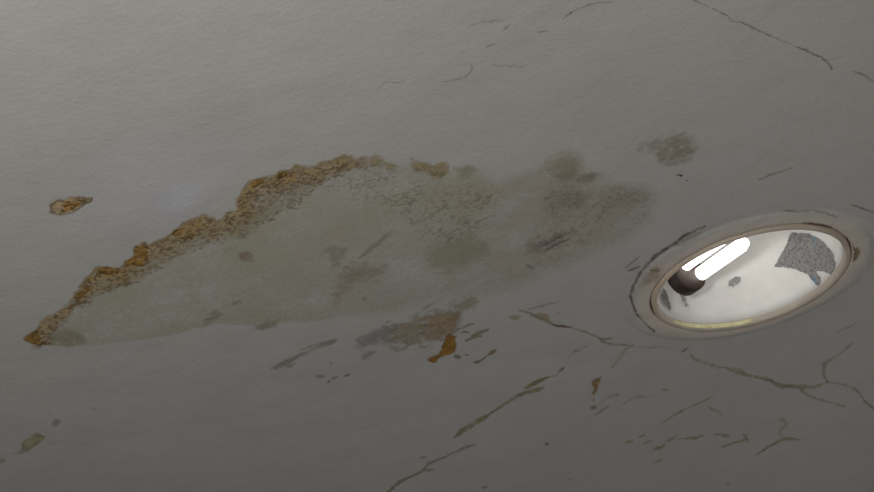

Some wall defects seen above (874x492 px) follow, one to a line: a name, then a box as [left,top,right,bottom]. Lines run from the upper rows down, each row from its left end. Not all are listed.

crack [787,210,839,232]
damp [24,155,377,348]
crack [626,226,705,332]
damp [358,299,471,356]
corrosion [428,335,457,363]
crack [511,310,628,346]
damp [454,368,564,438]
crack [690,355,874,409]